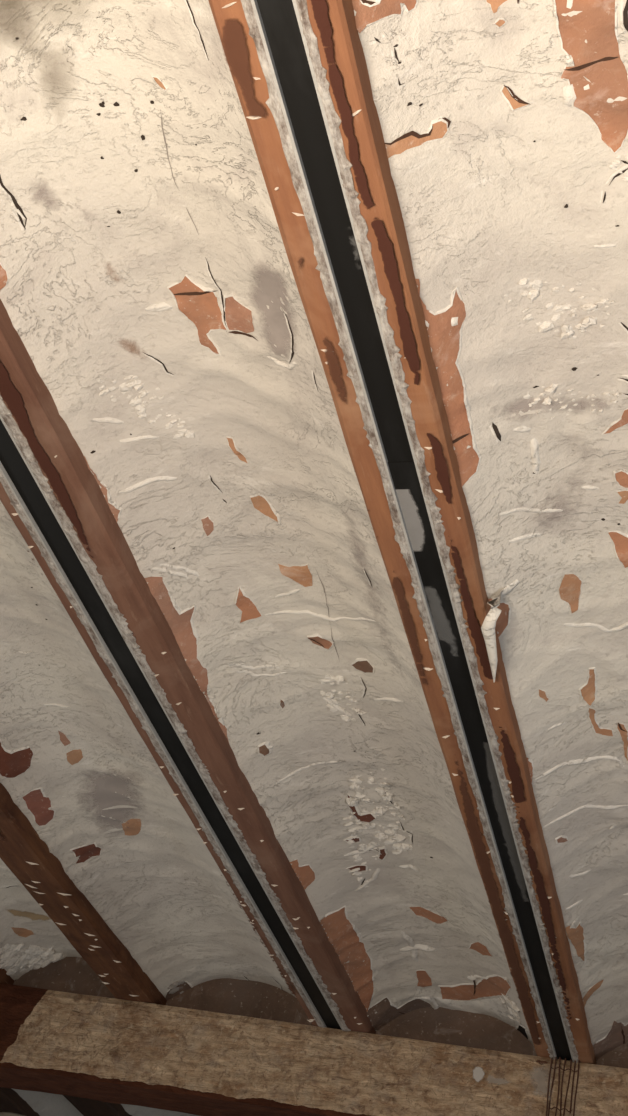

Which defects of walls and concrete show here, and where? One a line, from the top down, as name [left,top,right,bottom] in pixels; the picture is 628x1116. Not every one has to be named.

flaking render [352,0,419,34]
crack [620,0,628,33]
flaking render [553,0,628,181]
flaking render [385,116,451,158]
crack [0,176,27,231]
crack [600,160,628,203]
flaking render [167,274,258,356]
flaking render [578,667,628,761]
flaking render [0,739,34,778]
flaking render [320,905,529,1040]